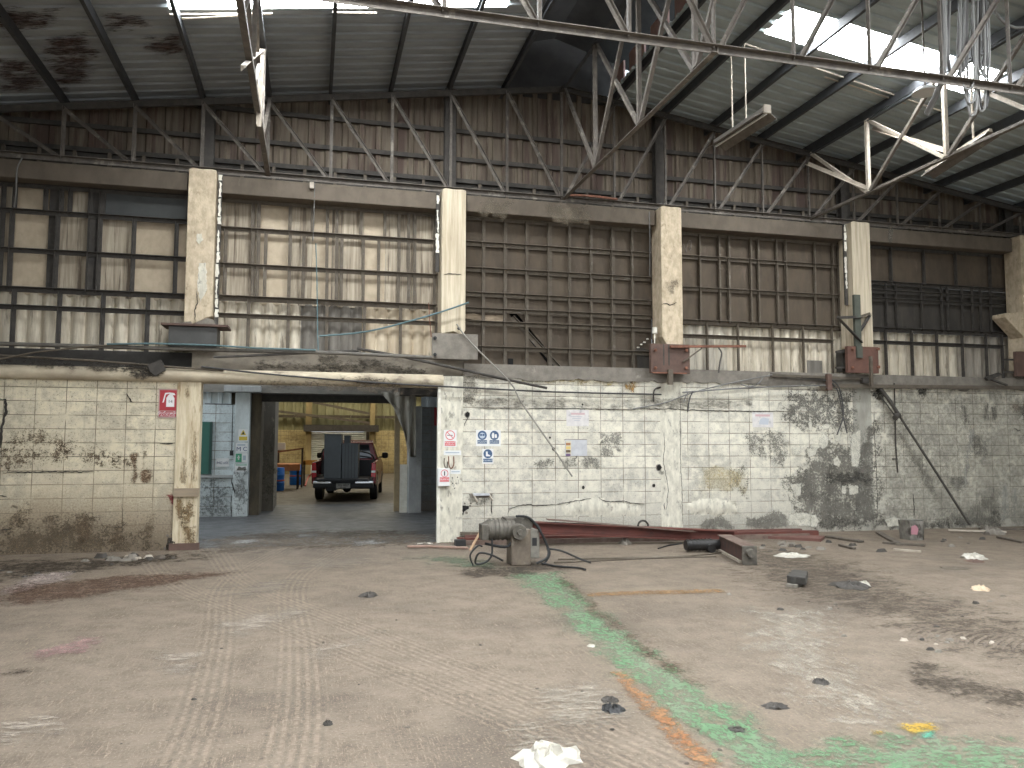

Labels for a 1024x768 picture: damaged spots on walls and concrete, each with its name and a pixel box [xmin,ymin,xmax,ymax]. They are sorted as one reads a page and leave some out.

rust [0,6,100,92]
rust [105,13,184,54]
crack [464,399,773,521]
damp [729,467,748,495]
damp [745,387,893,531]
damp [924,486,1017,528]